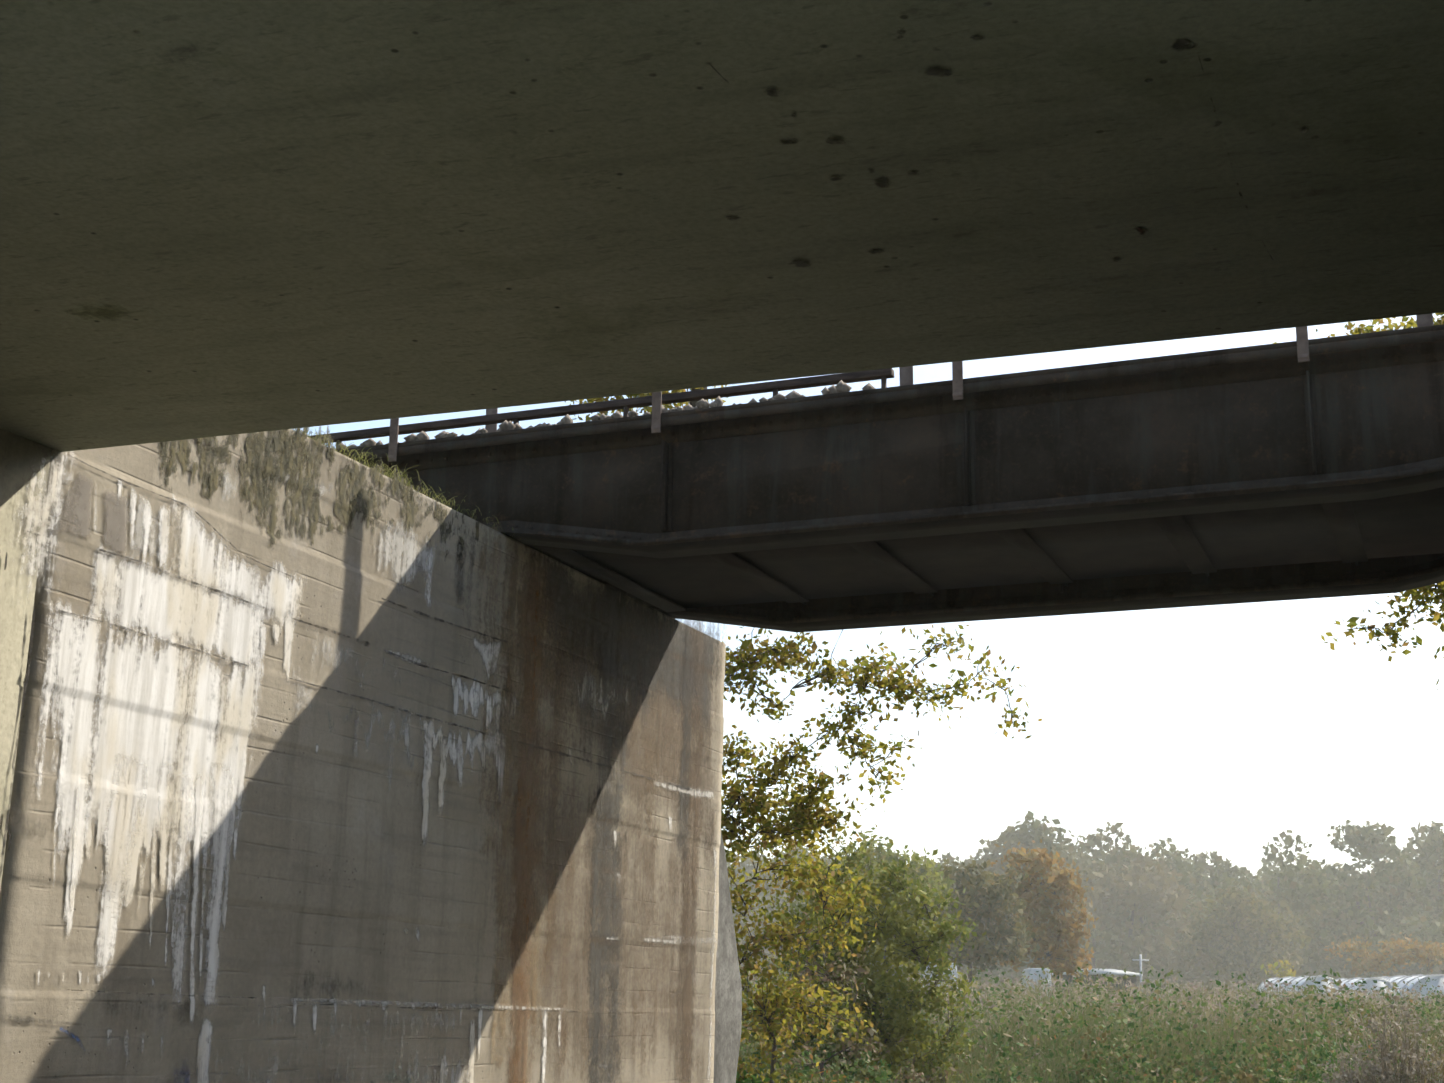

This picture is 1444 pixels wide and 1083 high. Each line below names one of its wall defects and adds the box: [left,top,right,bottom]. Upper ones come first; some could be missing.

water stain [19,454,73,581]
water stain [38,480,306,1083]
water stain [293,981,337,1030]
water stain [354,559,719,1083]